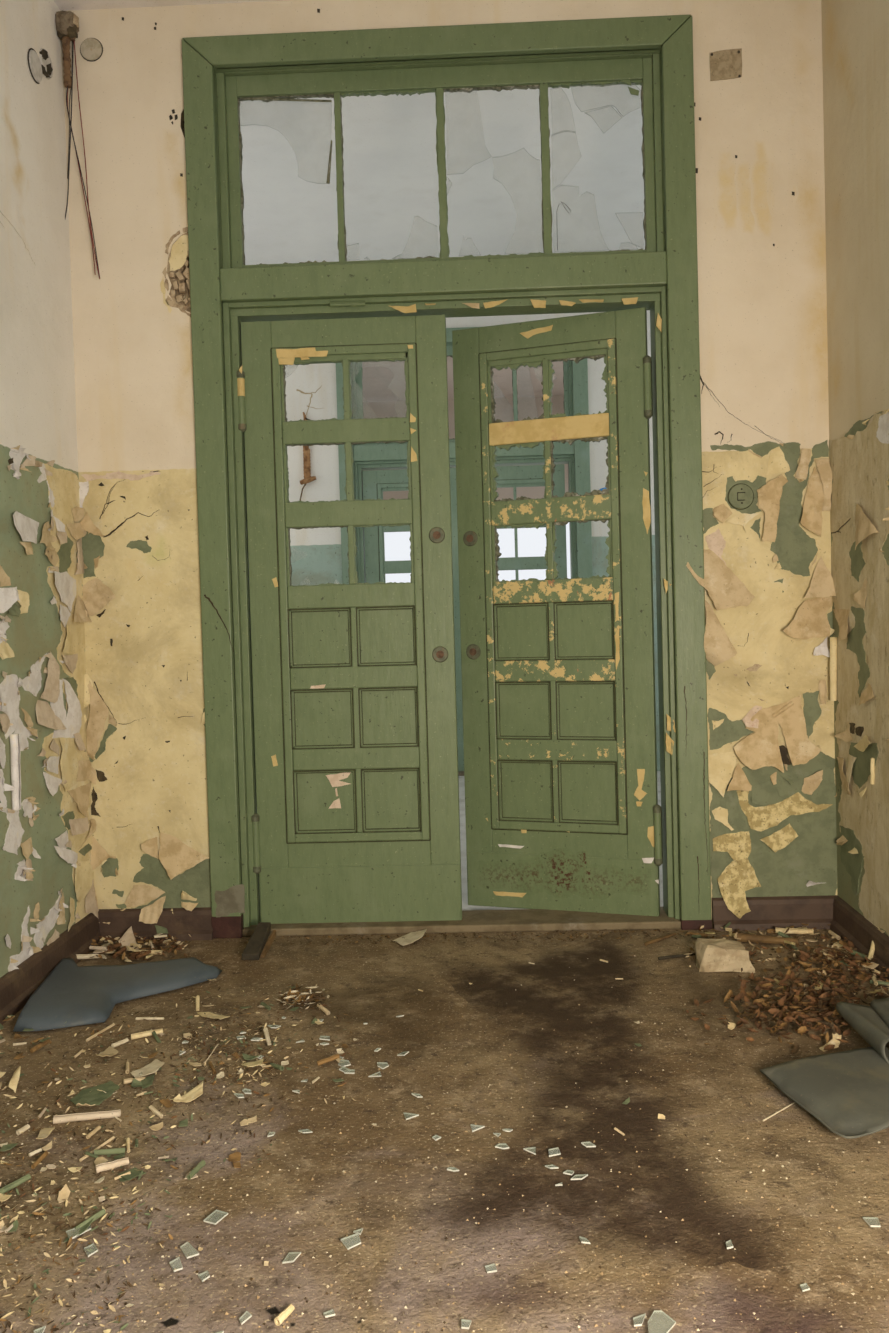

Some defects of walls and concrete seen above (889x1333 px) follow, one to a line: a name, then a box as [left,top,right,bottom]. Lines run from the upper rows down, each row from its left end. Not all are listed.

spalling [160,227,191,317]
peeling [0,445,245,972]
flaking render [686,409,889,936]